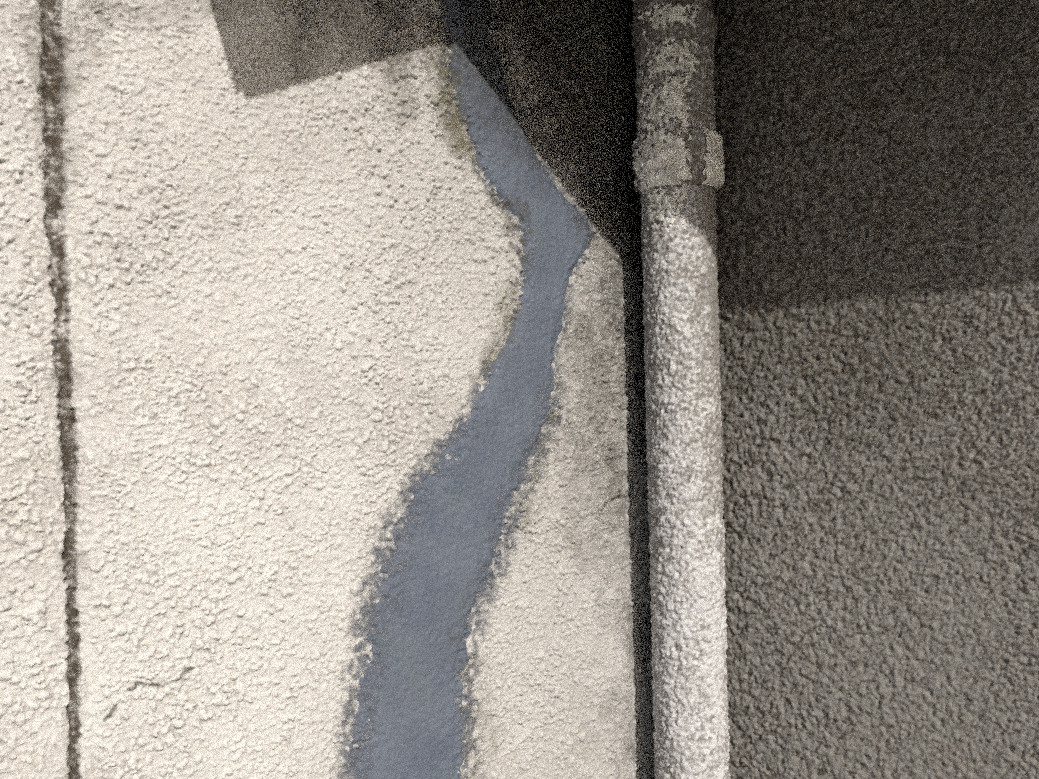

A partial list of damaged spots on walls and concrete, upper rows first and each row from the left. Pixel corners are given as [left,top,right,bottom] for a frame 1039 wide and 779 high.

leakage [507,0,641,254]